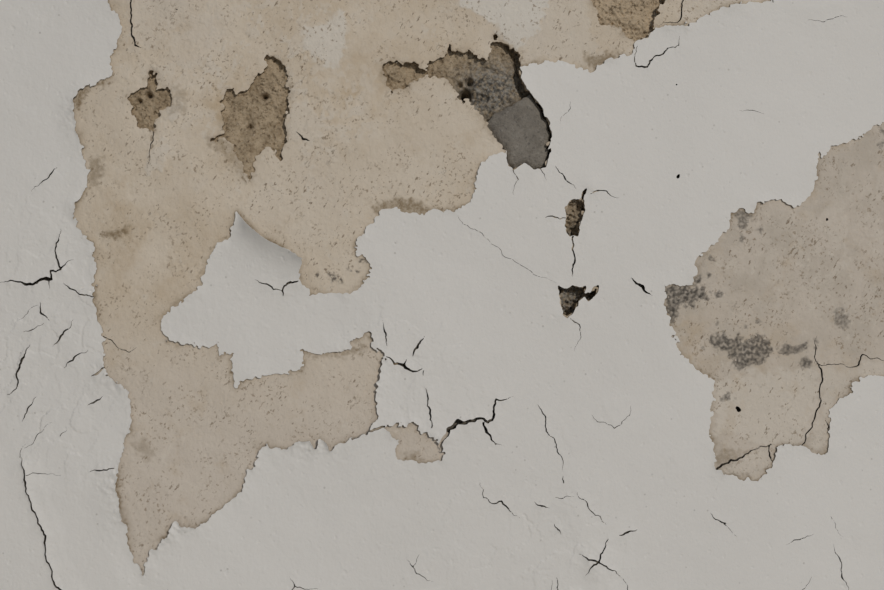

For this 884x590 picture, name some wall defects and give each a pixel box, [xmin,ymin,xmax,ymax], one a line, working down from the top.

crack [0,232,91,590]
peeling [73,0,773,575]
crack [383,324,510,451]
crack [480,405,636,590]
crack [716,444,773,470]
peeling [664,122,884,481]
crack [802,341,884,445]